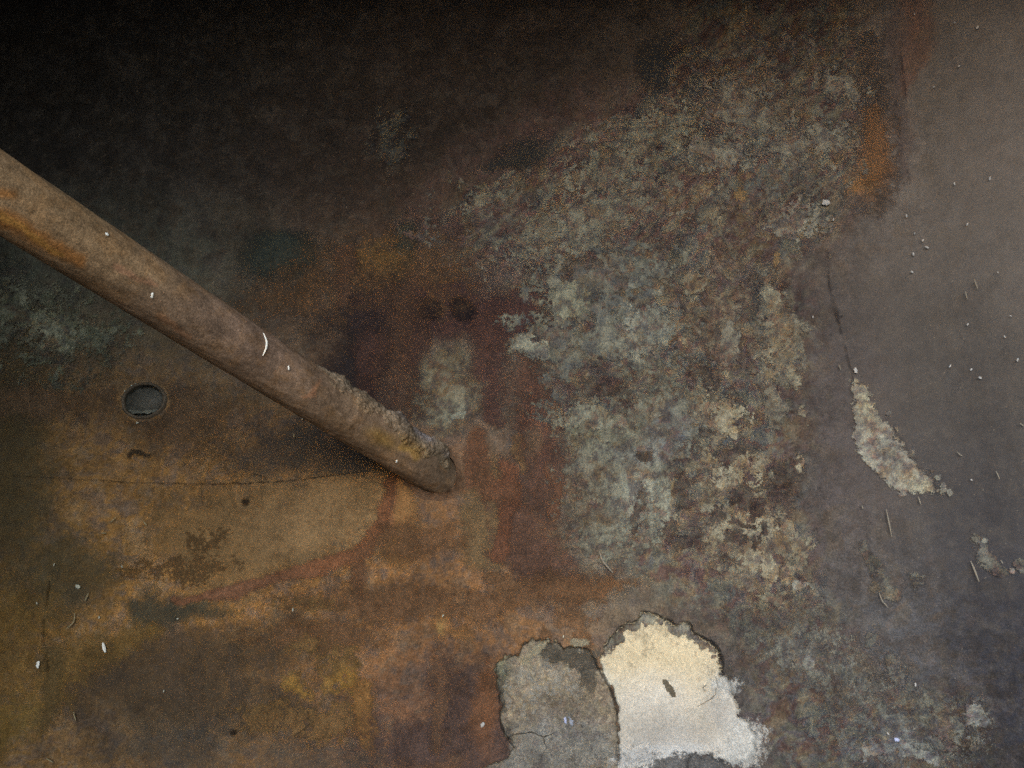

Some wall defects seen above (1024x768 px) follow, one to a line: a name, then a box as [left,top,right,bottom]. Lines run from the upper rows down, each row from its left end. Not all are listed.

rust [839,31,902,218]
rust [171,471,419,606]
rust [456,353,588,598]
peeling [394,0,996,768]
rust [219,626,510,768]